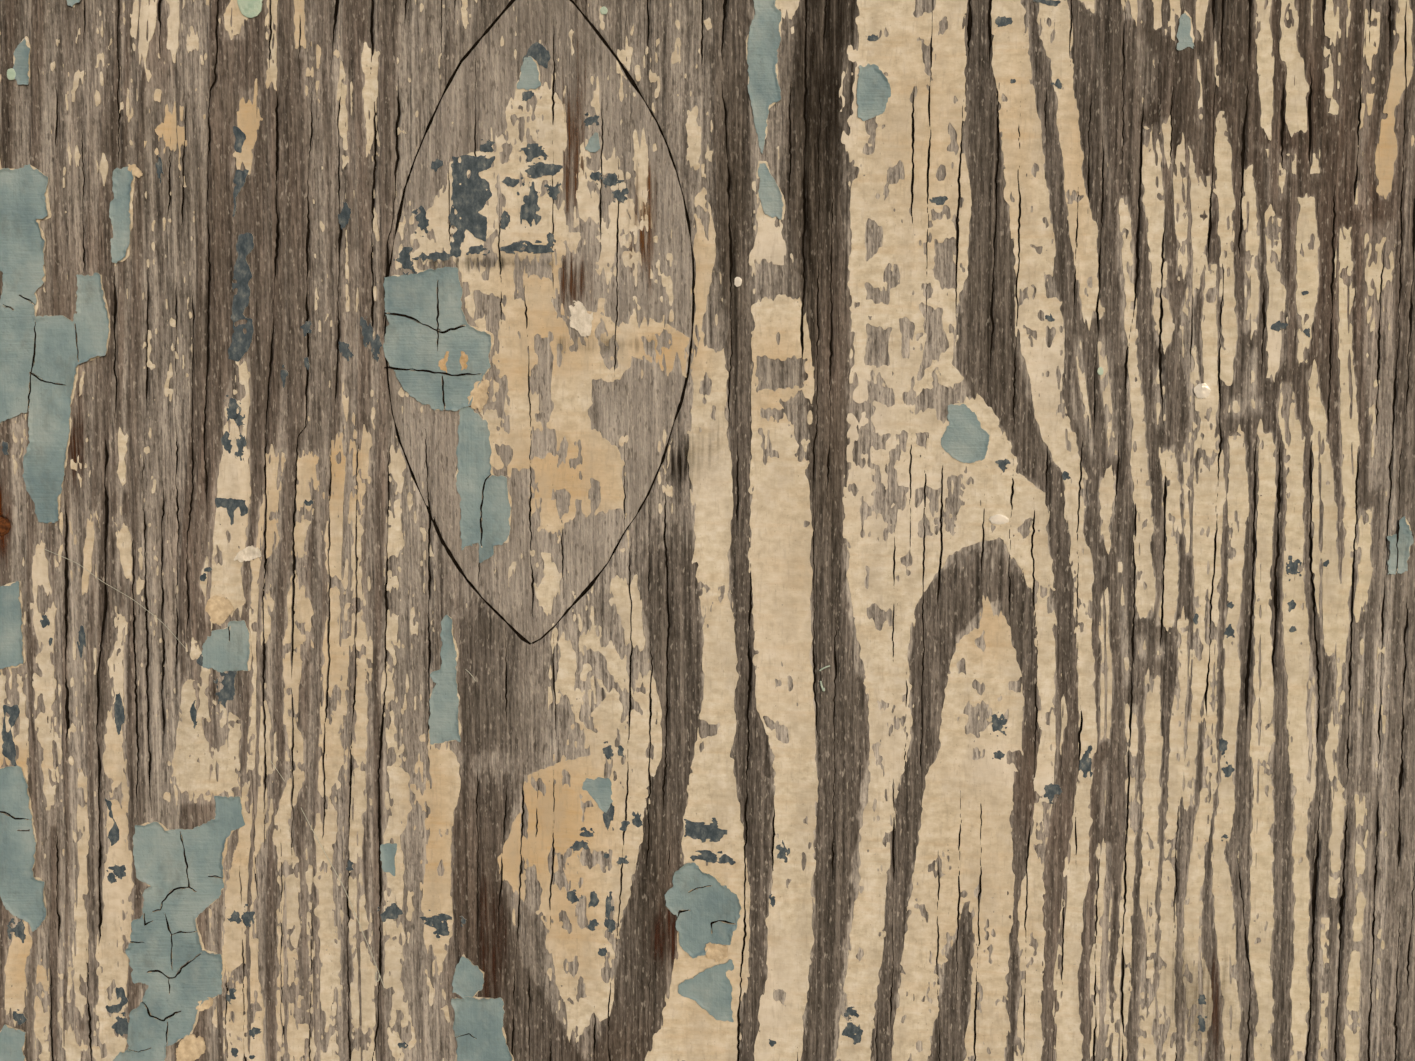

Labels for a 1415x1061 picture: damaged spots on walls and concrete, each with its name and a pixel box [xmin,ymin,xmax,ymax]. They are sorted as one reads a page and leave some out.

peeling [0,161,110,523]
peeling [67,145,135,263]
crack [50,0,219,1061]
peeling [131,0,199,71]
peeling [0,232,467,1061]
peeling [233,0,321,217]
crack [239,0,695,1061]
peeling [337,42,819,1061]
crack [701,0,739,536]
crack [737,572,775,1061]
peeling [746,0,800,277]
crack [788,0,837,879]